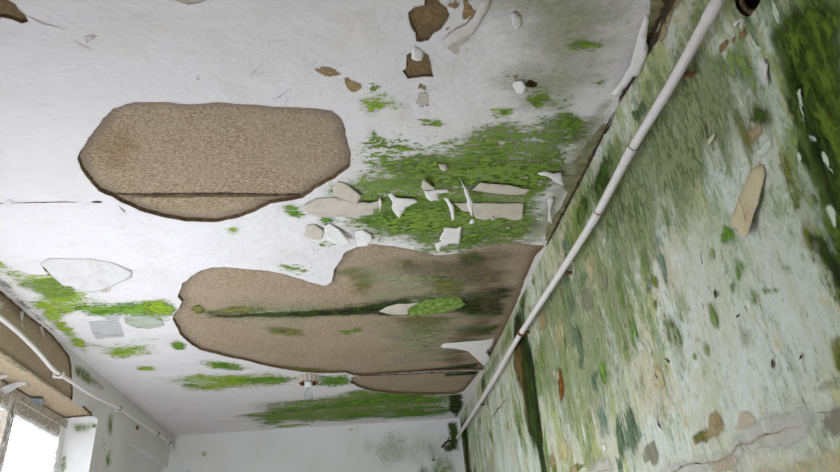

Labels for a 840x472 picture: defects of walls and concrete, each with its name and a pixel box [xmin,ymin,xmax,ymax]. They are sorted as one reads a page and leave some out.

spalling [0,0,28,24]
spalling [403,0,491,107]
crack [27,198,101,206]
peeling [547,196,555,224]
peeling [731,164,765,237]
spalling [77,102,544,395]
crack [674,409,840,472]